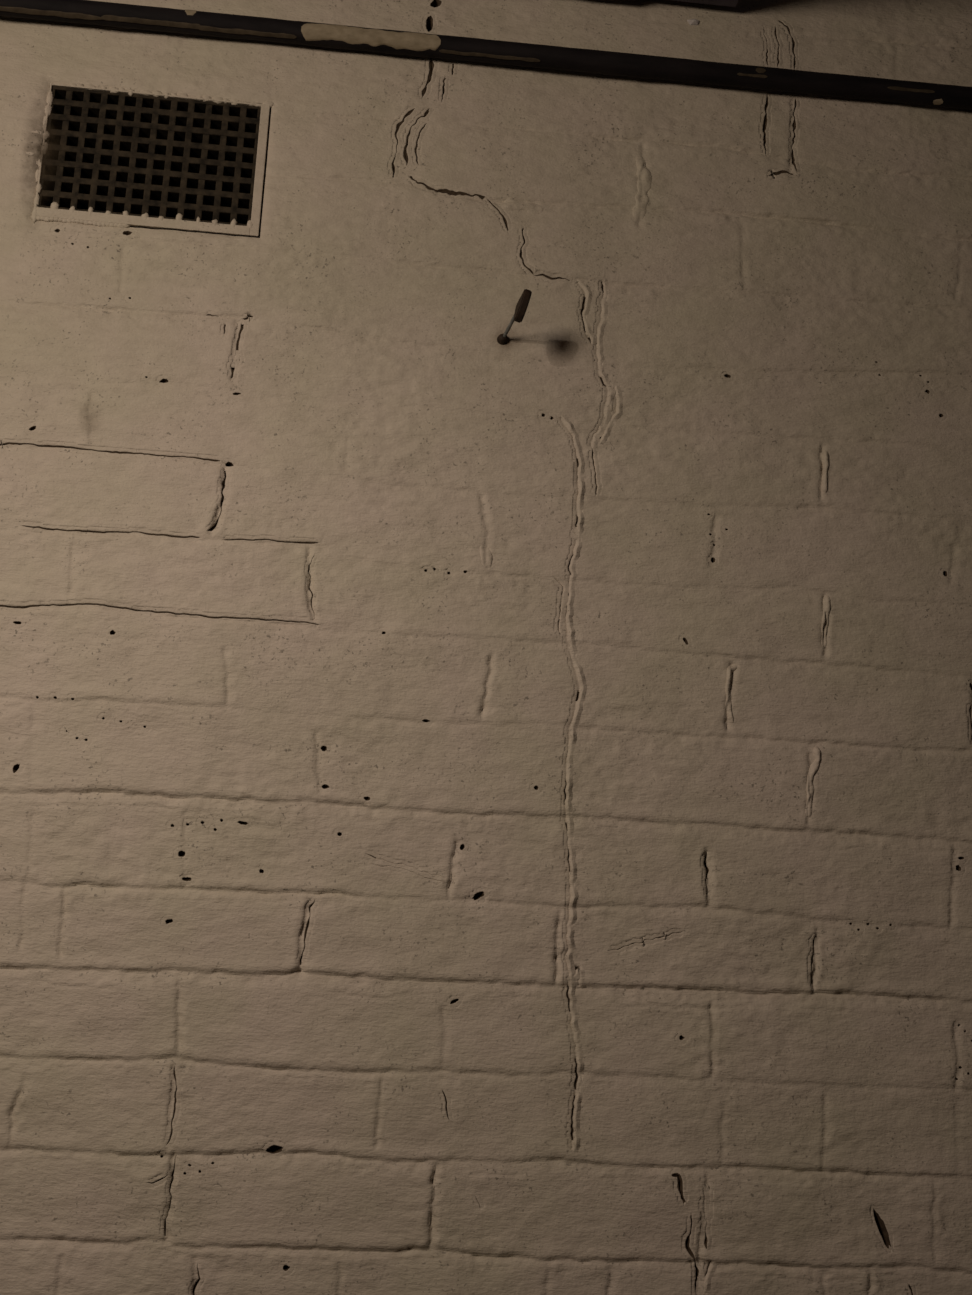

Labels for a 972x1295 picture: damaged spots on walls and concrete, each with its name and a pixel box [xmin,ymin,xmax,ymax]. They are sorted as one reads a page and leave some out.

crack [388,57,686,1158]
crack [759,18,802,179]